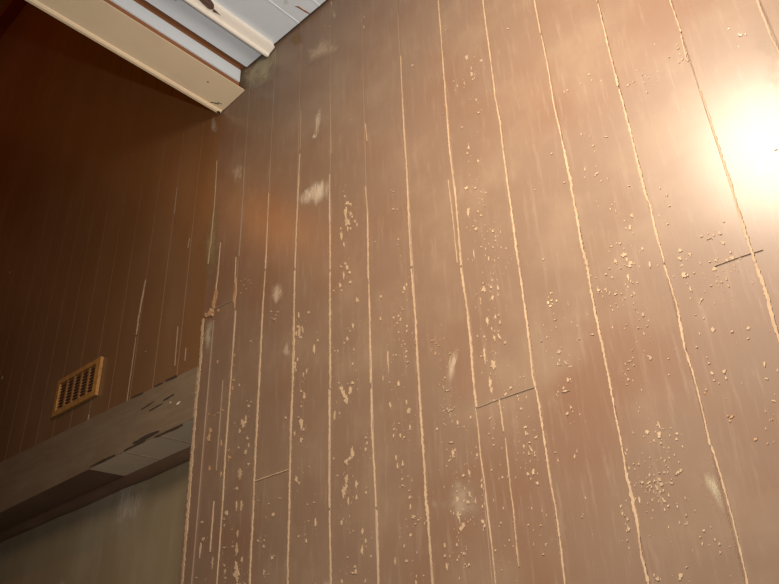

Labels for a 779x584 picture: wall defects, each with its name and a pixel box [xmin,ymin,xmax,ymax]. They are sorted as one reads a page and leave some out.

peeling [332,184,359,246]
peeling [590,242,658,337]
peeling [333,376,358,420]
peeling [211,400,252,584]
peeling [336,433,372,506]
peeling [627,422,696,525]